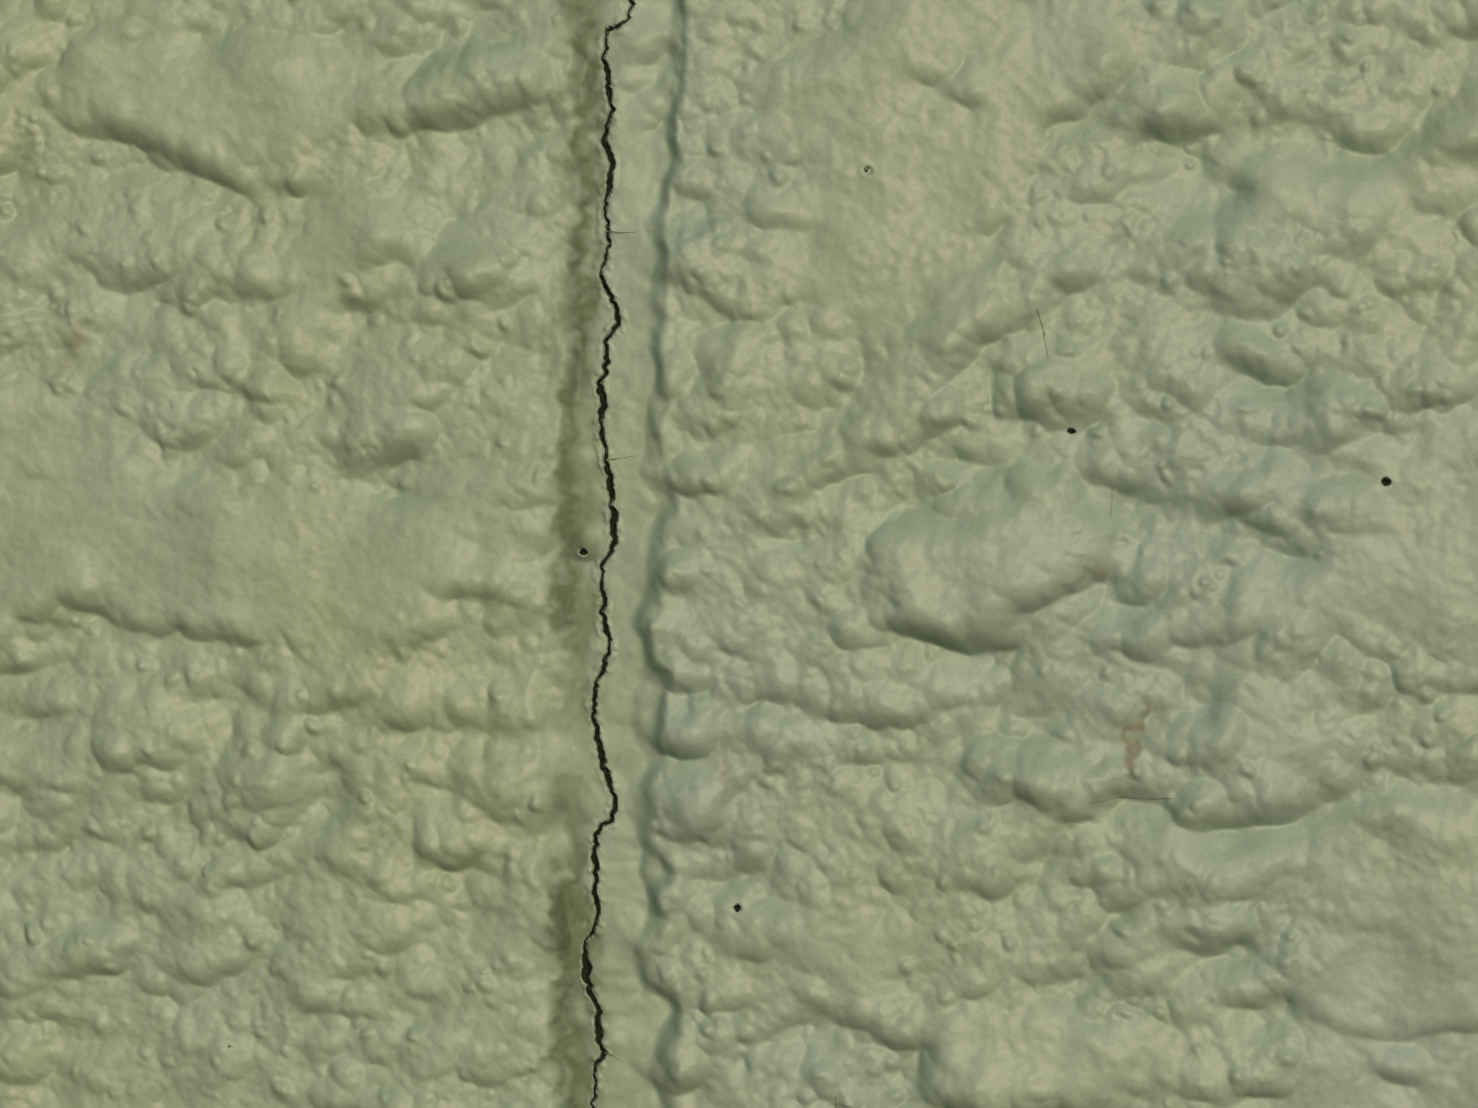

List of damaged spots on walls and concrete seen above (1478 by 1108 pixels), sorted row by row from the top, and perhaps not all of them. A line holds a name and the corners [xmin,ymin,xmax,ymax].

crack [582,0,633,1108]